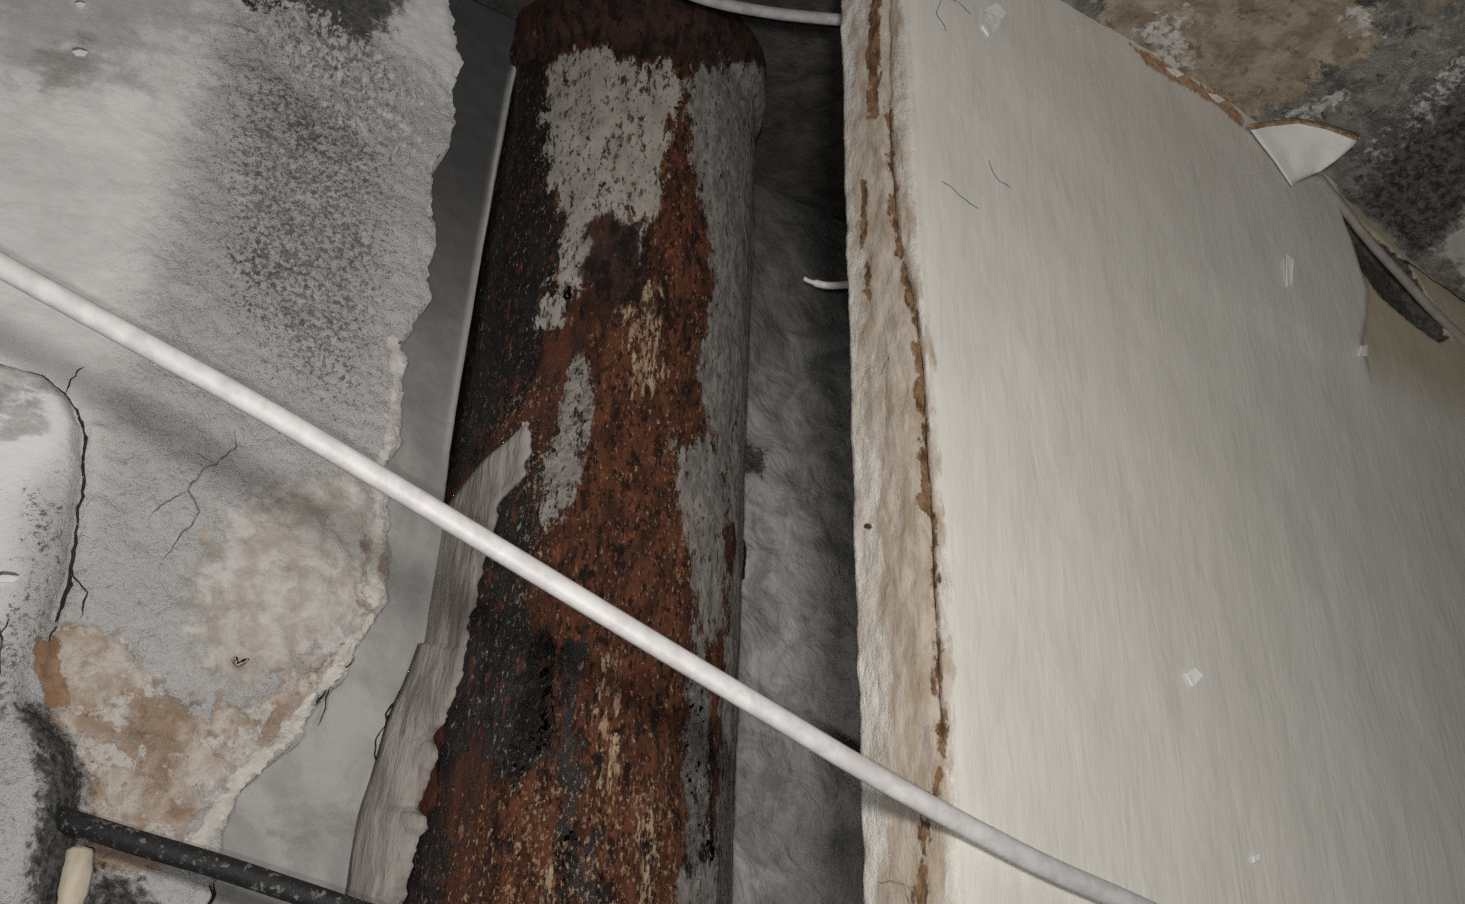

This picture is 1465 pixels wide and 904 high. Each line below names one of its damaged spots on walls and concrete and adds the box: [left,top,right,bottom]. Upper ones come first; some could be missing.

crack [0,364,88,642]
crack [148,430,238,560]
water stain [183,0,441,444]
flaking render [374,333,406,466]
corrosion [536,0,767,672]
corrosion [852,0,955,803]
flaking render [1096,0,1392,186]
water stain [1276,88,1350,121]
water stain [1346,56,1465,251]
crack [0,620,9,674]
flaking render [33,471,390,848]
corrosion [461,587,723,904]